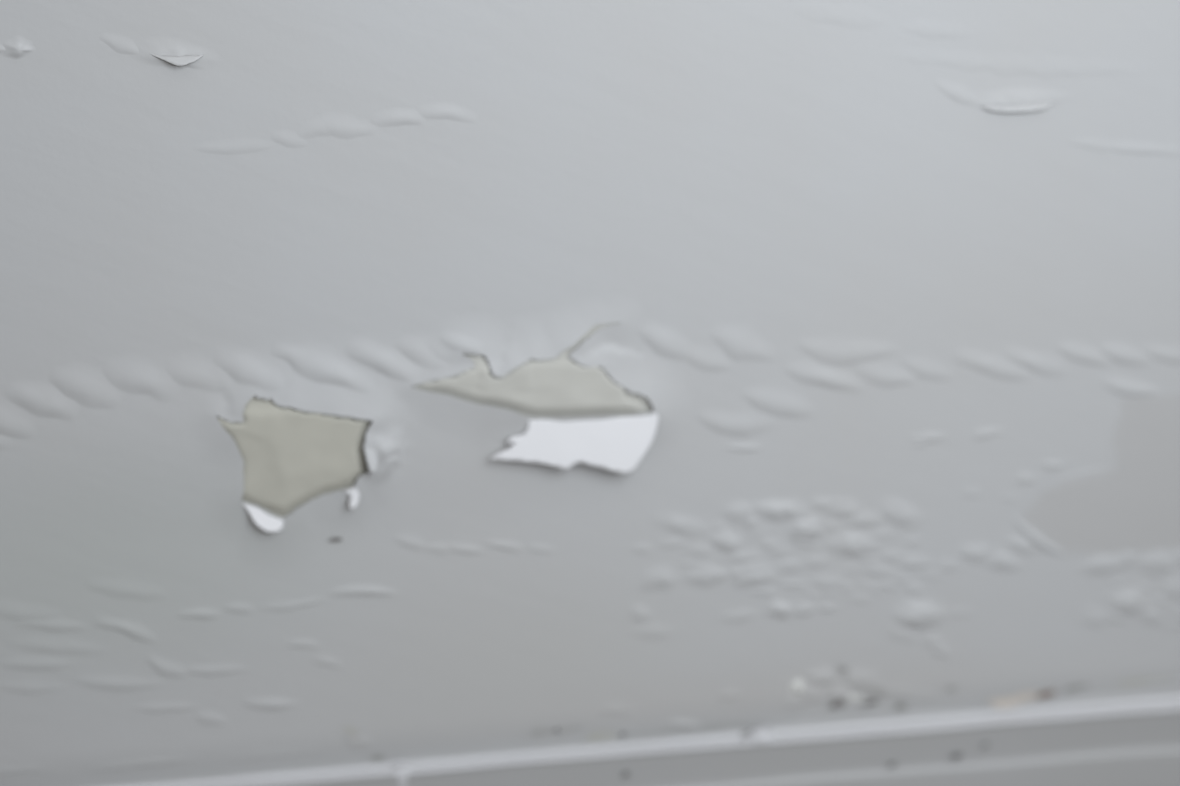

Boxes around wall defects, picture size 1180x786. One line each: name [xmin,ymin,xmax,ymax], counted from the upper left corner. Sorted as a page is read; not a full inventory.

peeling [99,32,224,71]
peeling [184,291,700,577]